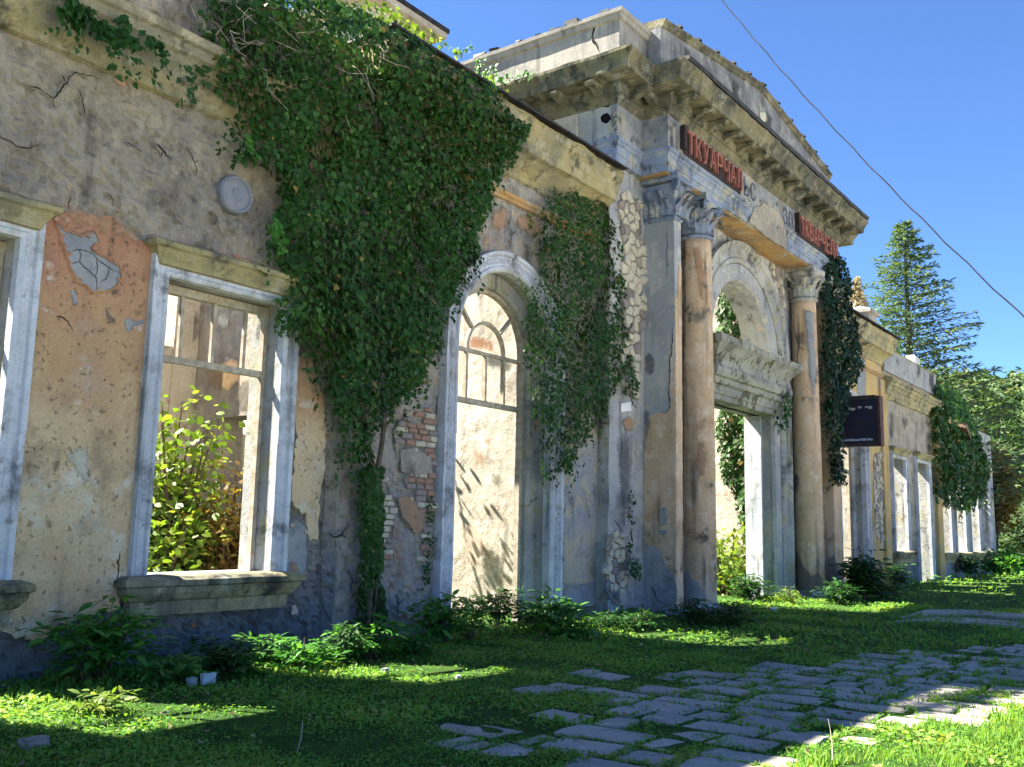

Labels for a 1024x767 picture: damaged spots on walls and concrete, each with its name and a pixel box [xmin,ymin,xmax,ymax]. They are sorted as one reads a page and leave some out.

crack [22,71,102,122]
crack [0,136,41,150]
crack [126,142,198,176]
flaking render [54,220,123,307]
flaking render [380,404,438,568]
flaking render [287,517,309,575]